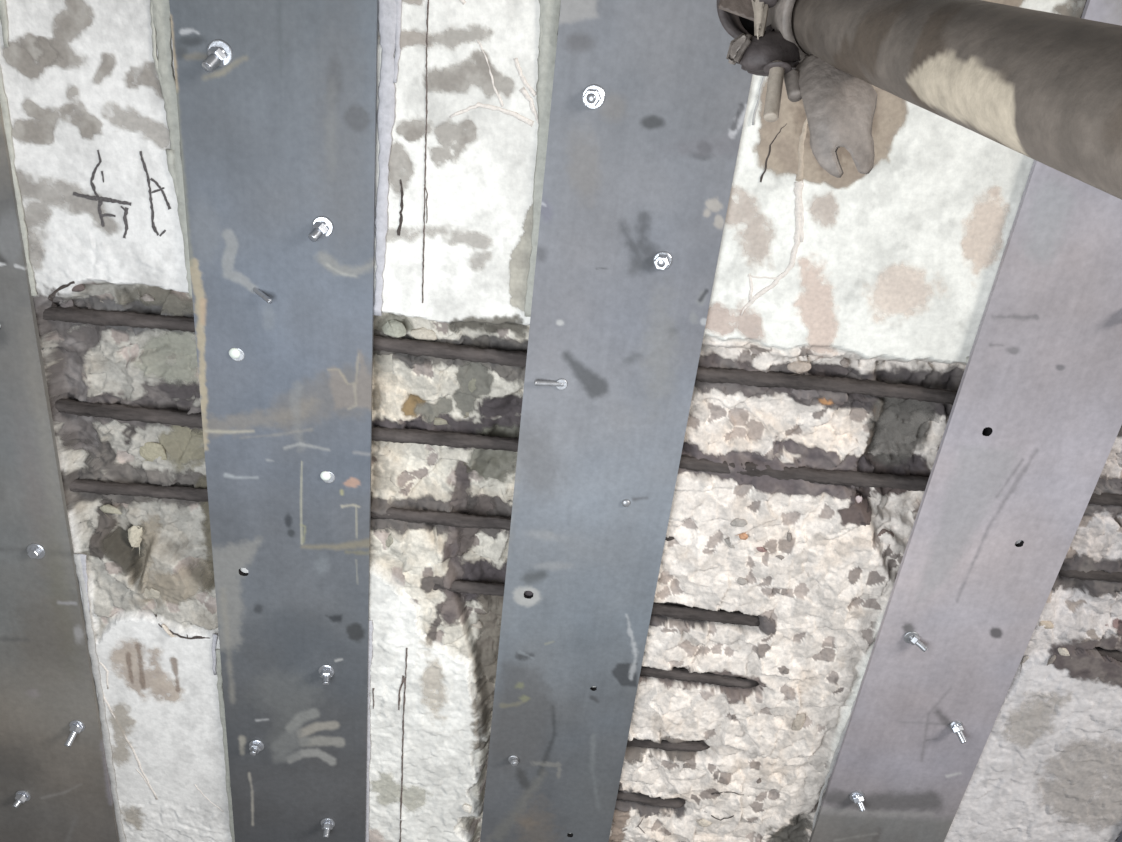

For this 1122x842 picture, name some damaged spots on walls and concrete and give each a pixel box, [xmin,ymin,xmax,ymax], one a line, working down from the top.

water stain [3,0,93,79]
water stain [12,87,170,148]
crack [397,0,429,303]
water stain [400,27,514,96]
crack [760,125,786,182]
water stain [756,78,907,224]
water stain [449,204,533,337]
spalling [39,278,219,645]
spalling [370,311,530,842]
spalling [609,333,966,842]
spalling [998,436,1122,715]
crack [372,648,408,842]